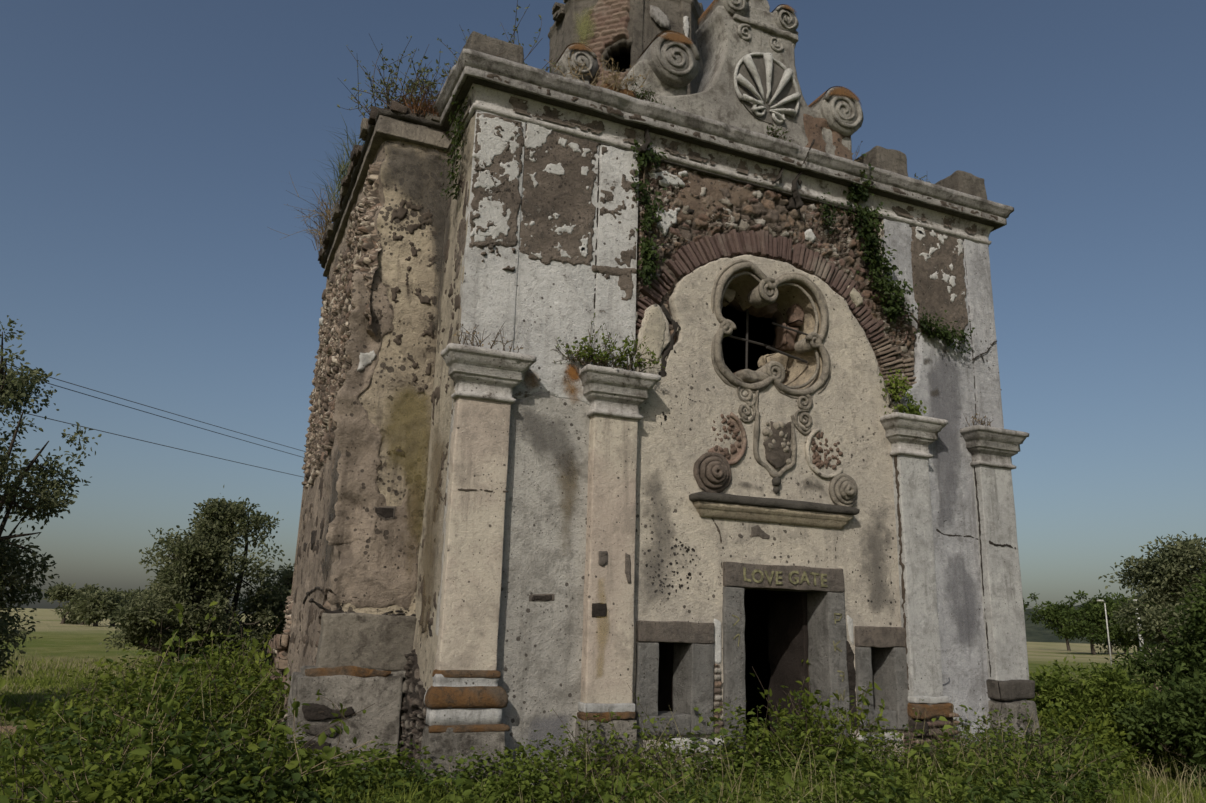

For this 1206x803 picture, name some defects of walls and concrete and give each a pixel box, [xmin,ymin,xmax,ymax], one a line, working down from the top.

spalling [276,74,998,695]
crack [303,587,433,637]
crack [894,455,909,690]
crack [936,467,1016,677]